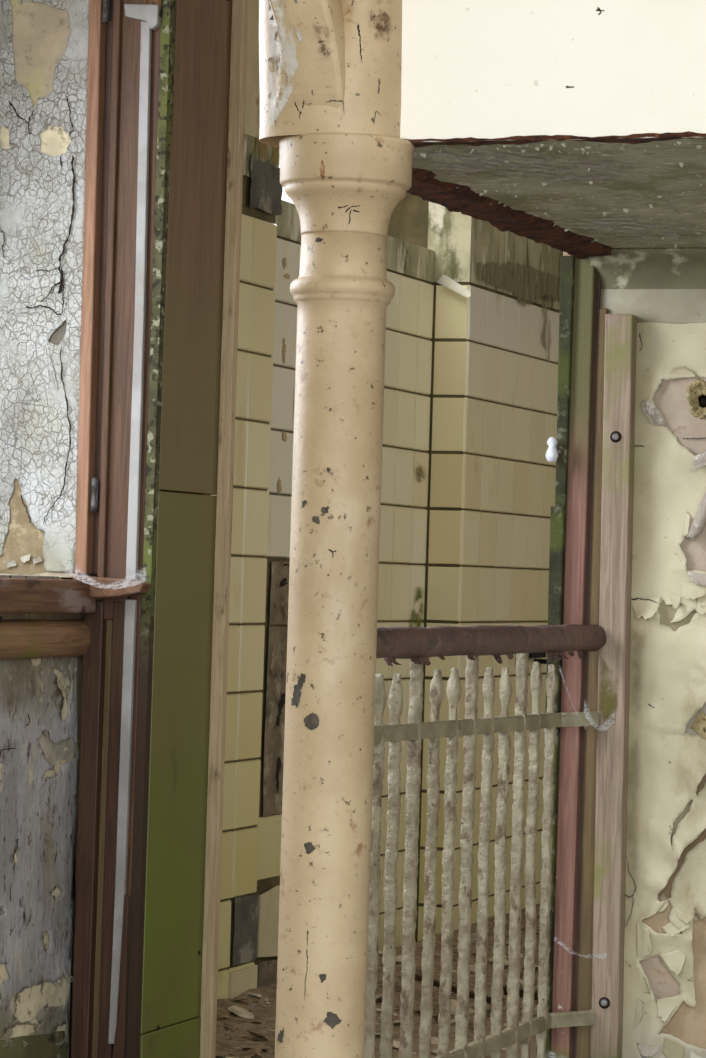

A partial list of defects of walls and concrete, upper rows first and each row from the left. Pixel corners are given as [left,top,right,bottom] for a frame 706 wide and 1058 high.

flaking render [10,0,70,108]
crack [8,100,34,134]
corrosion [405,131,706,147]
crack [26,95,75,315]
crack [21,345,71,523]
peeling [642,366,706,471]
flaking render [0,478,46,575]
peeling [631,492,706,631]
peeling [685,703,706,739]
peeling [233,885,280,987]
peeling [634,774,706,1058]
flaking render [0,964,73,1048]